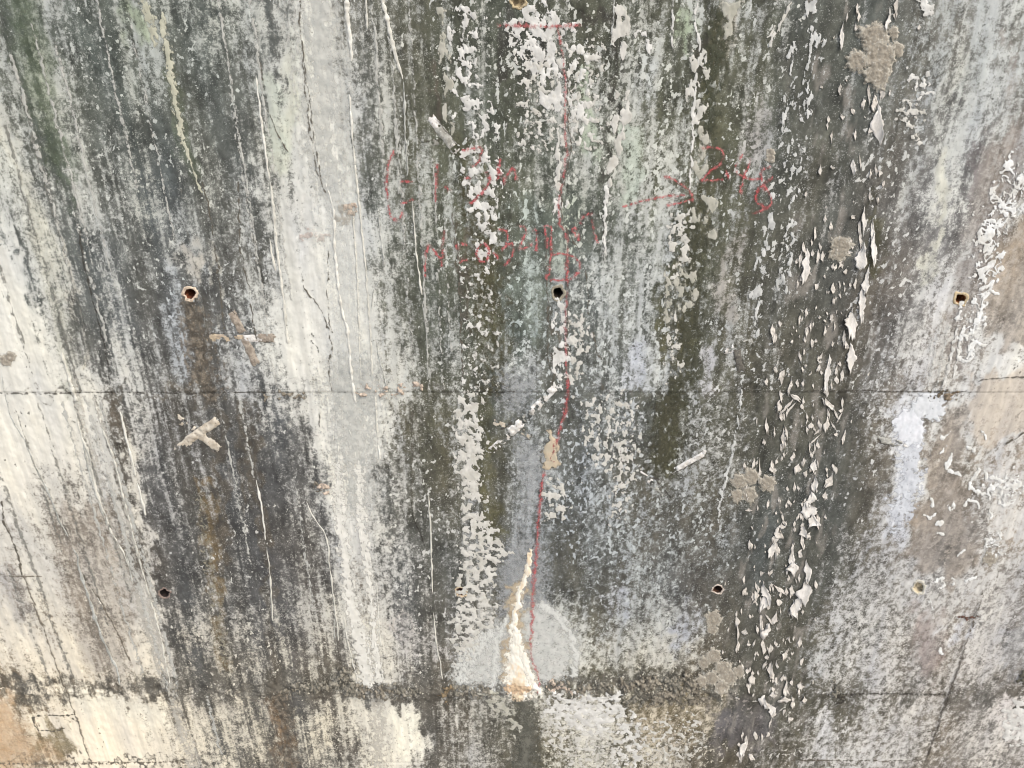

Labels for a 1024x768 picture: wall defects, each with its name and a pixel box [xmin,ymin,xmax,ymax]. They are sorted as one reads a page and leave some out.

leakage [0,125,203,768]
leakage [138,0,203,193]
leakage [217,0,292,397]
leakage [238,401,273,621]
leakage [284,0,538,768]
leakage [433,432,581,768]
peeling [436,0,653,666]
leakage [656,195,715,414]
peeling [661,46,718,385]
peeling [718,0,885,764]
peeling [826,66,935,146]
peeling [884,0,898,31]